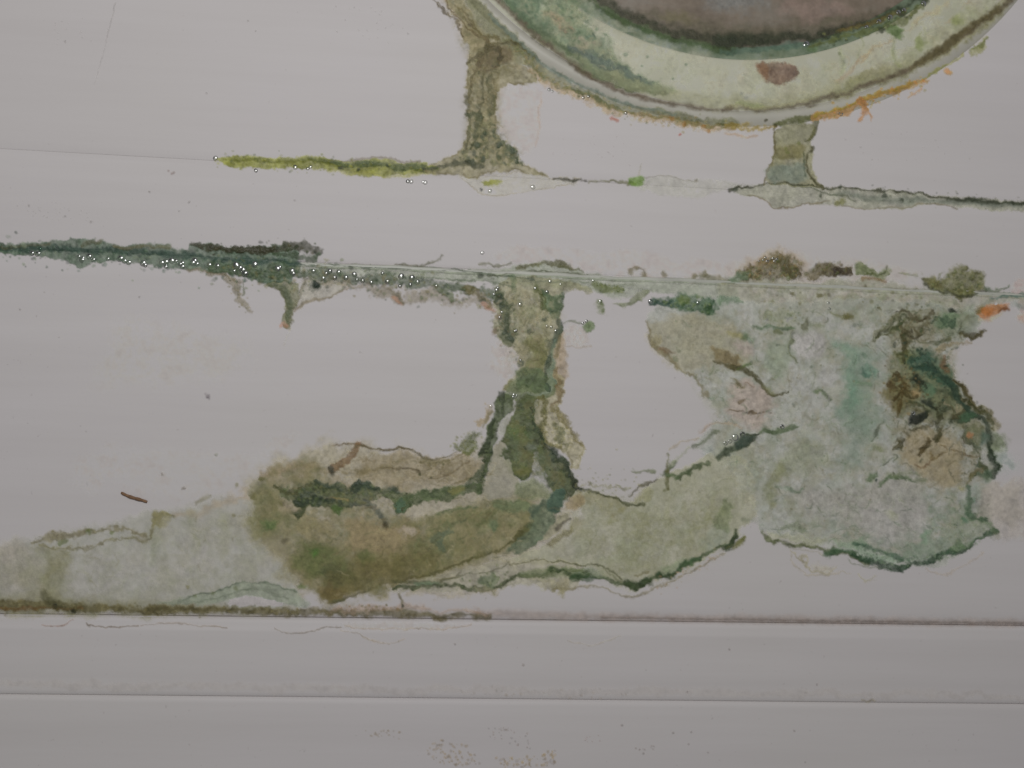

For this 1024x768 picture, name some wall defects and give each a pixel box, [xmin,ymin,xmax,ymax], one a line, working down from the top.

damp [756,61,799,84]
mould [298,280,344,308]
damp [731,365,784,397]
damp [479,379,584,554]
damp [654,426,797,490]
damp [915,348,1000,521]